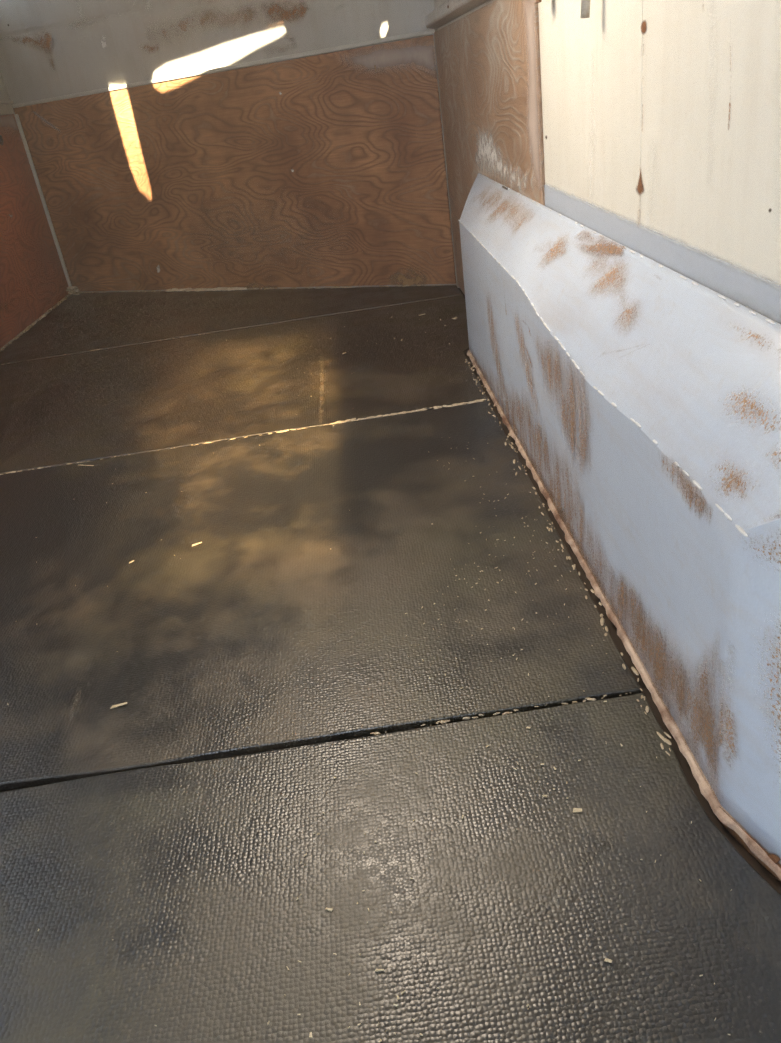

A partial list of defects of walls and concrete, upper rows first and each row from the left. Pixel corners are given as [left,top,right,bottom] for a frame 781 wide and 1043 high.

rust [582,232,623,289]
rust [730,392,777,431]
rust [472,301,735,774]
rust [717,811,781,882]